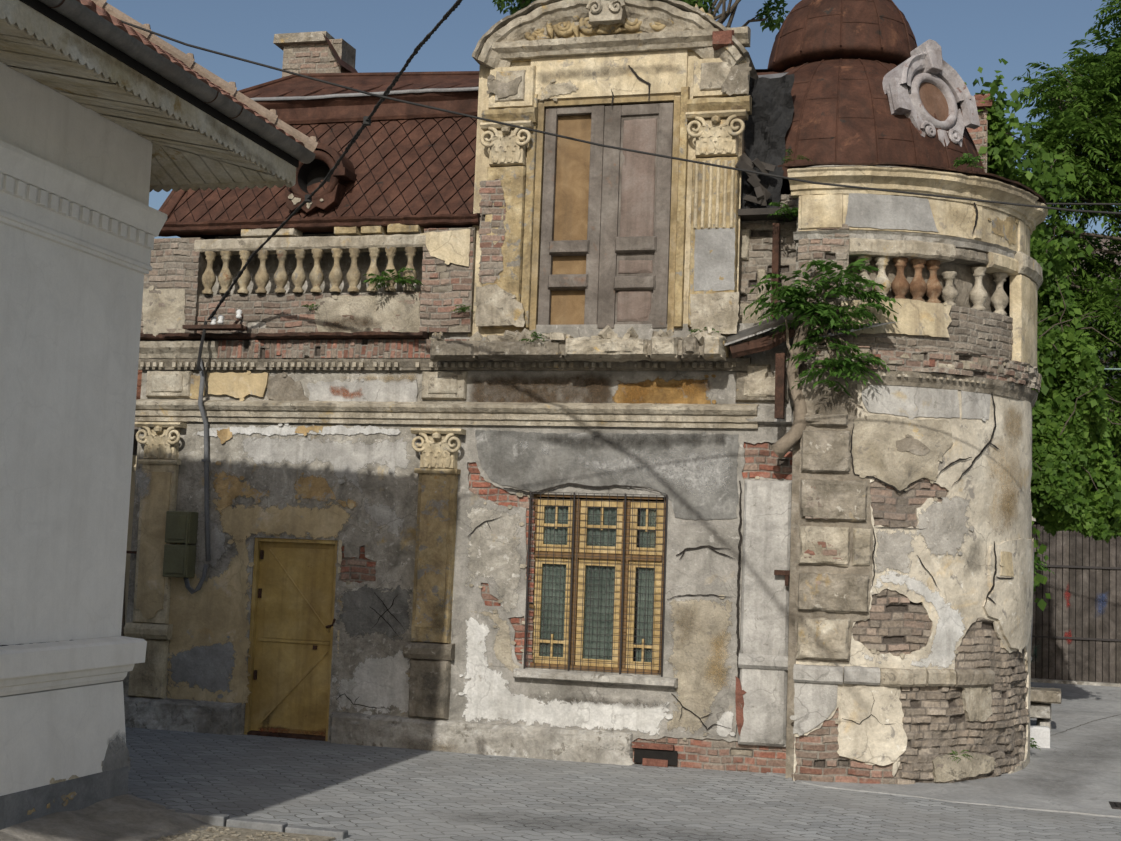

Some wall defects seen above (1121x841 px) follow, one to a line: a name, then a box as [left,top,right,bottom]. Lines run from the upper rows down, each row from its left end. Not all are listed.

crack [628,65,651,102]
crack [503,483,666,494]
spalling [742,442,793,480]
spalling [859,473,948,529]
crack [850,392,1000,493]
peeling [166,461,377,705]
spalling [468,462,535,667]
crack [670,481,742,678]
crack [983,541,1014,608]
spalling [852,589,932,659]
spalling [553,617,1049,784]